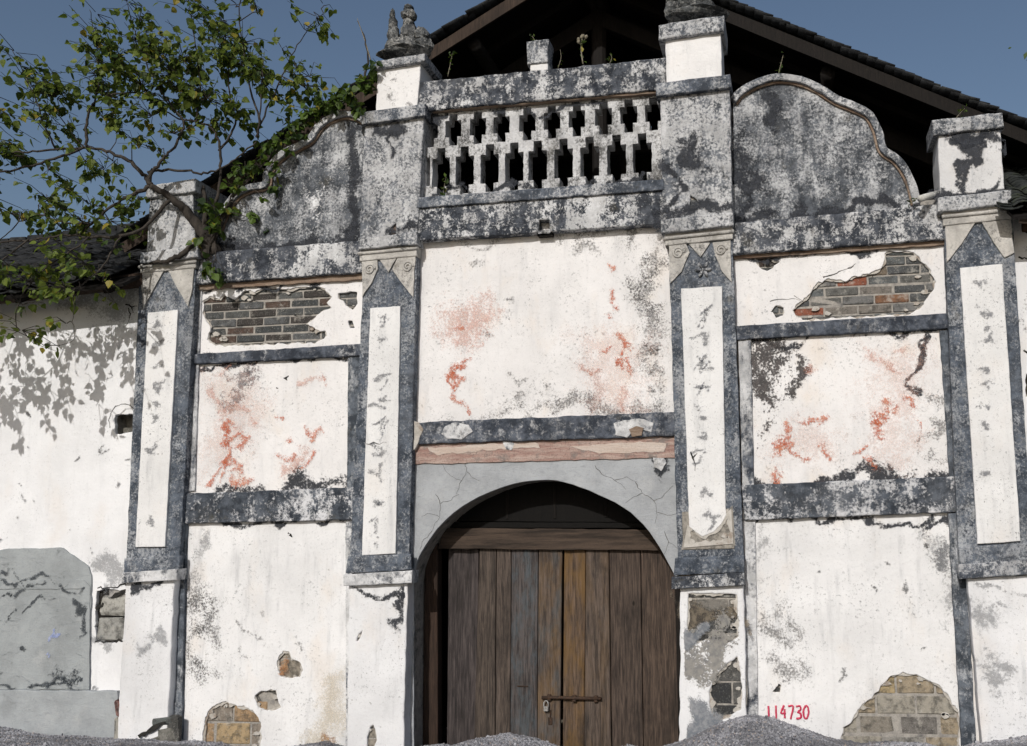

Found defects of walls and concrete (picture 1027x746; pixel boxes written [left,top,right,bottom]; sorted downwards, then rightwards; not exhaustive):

leakage [761,87,783,135]
leakage [218,121,408,250]
leakage [571,126,901,234]
flaking render [203,287,358,347]
leakage [483,247,669,419]
flaking render [772,251,936,321]
leakage [845,250,879,259]
crack [421,463,479,547]
crack [595,466,677,554]
flaking render [203,690,281,746]
flaking render [709,657,748,720]
flaking render [841,672,960,746]